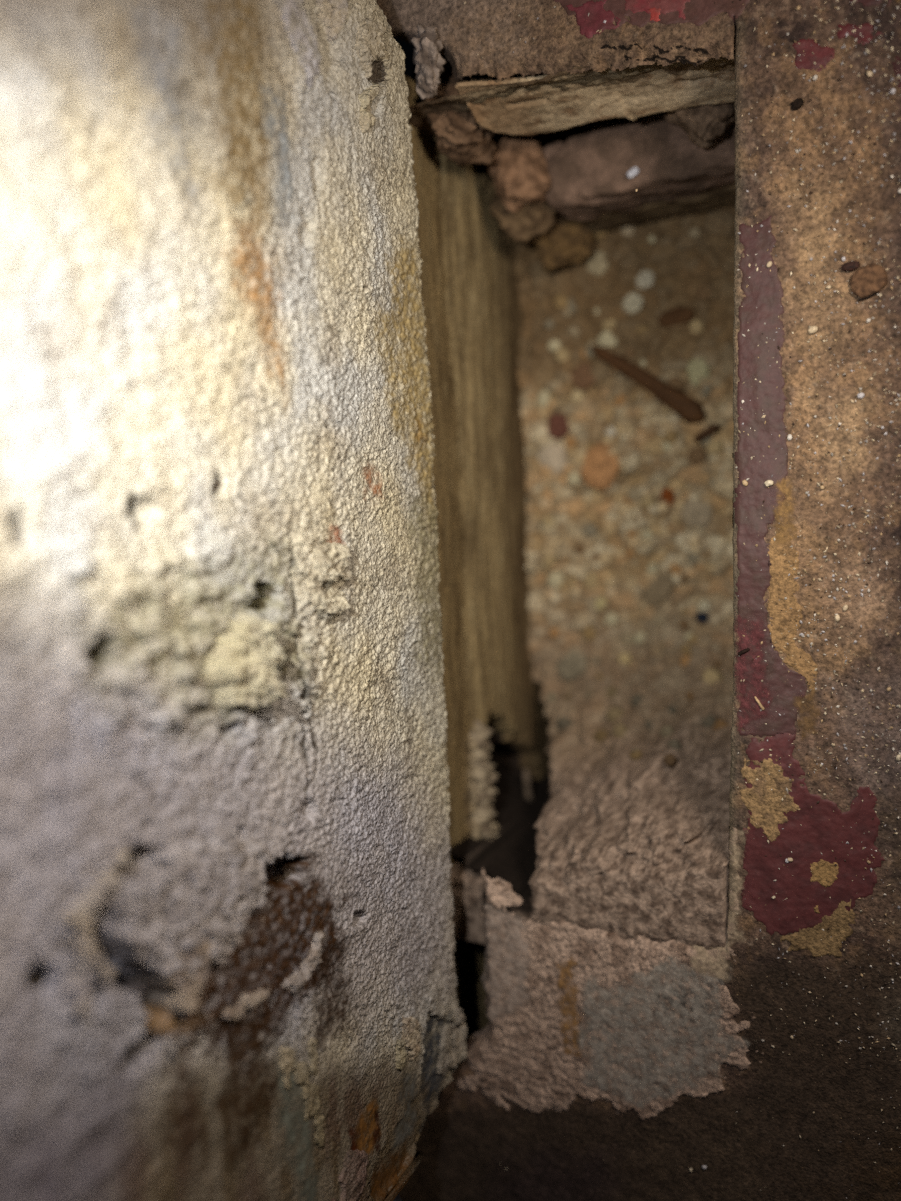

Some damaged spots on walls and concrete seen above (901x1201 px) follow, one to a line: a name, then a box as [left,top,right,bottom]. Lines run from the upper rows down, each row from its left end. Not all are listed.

peeling [553,0,750,38]
peeling [792,23,883,74]
spalling [245,582,276,618]
peeling [732,215,885,957]